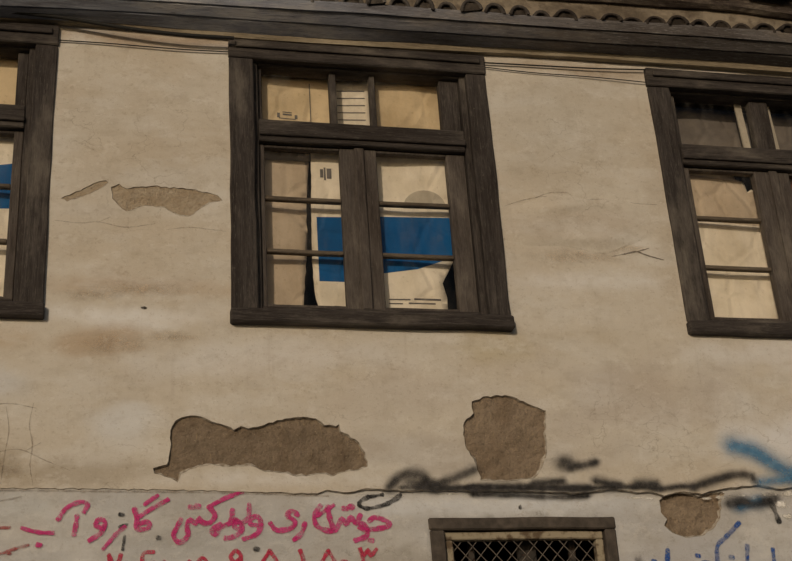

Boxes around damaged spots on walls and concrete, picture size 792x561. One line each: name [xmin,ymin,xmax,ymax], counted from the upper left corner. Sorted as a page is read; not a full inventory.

peeling [61,180,222,216]
spalling [153,415,368,482]
spalling [463,395,547,482]
spalling [632,491,792,538]